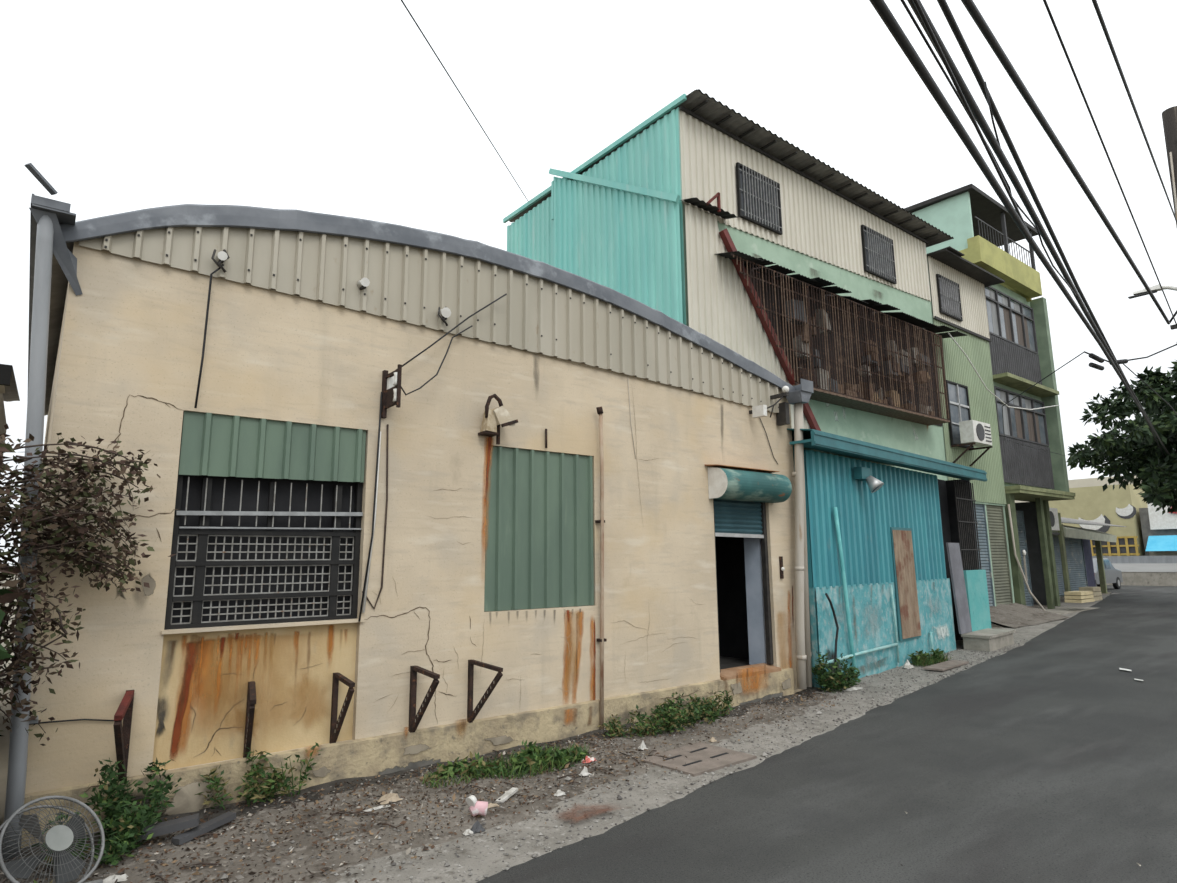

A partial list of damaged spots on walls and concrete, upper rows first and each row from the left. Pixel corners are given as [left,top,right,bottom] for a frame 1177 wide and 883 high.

crack [107,395,181,451]
corrosion [171,636,204,757]
corrosion [216,633,267,701]
crack [364,576,484,722]
corrosion [563,610,596,722]